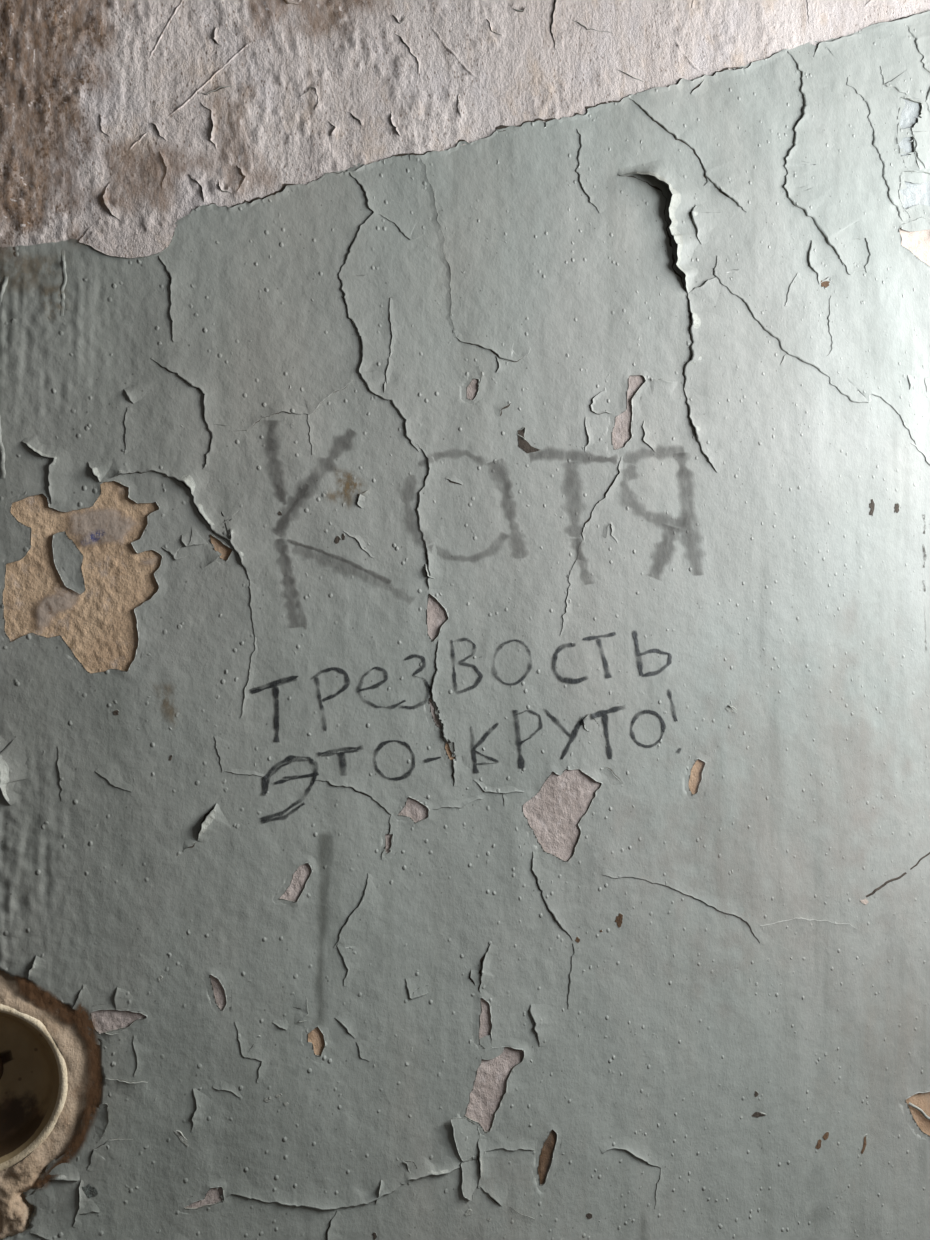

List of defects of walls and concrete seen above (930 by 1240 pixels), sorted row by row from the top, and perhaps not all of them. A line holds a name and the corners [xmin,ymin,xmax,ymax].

peeling [783,22,930,288]
crack [105,0,930,777]
peeling [0,435,238,681]
peeling [0,735,29,805]
crack [191,640,524,1132]
crack [529,851,599,1047]
peeling [513,759,623,869]
crack [25,985,152,1240]
crack [216,1131,535,1240]
peeling [451,989,535,1200]
crack [598,1136,664,1209]
peeling [897,1083,930,1142]